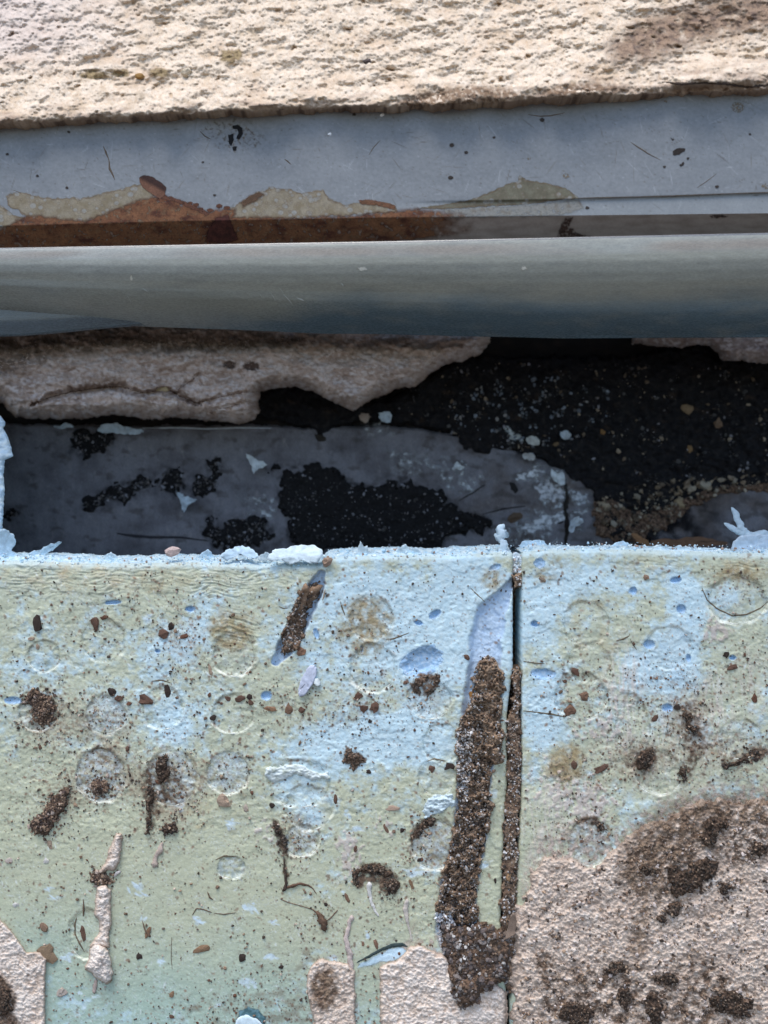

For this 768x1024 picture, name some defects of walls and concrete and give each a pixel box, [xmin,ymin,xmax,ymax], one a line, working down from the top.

corrosion [0,175,454,248]
spalling [224,361,259,370]
peeling [378,411,392,423]
peeling [54,423,144,461]
peeling [522,436,540,461]
peeling [81,457,222,513]
peeling [551,469,565,486]
peeling [0,508,62,557]
peeling [199,454,547,570]
peeling [569,516,583,533]
peeling [653,507,768,551]
crack [428,552,563,1024]